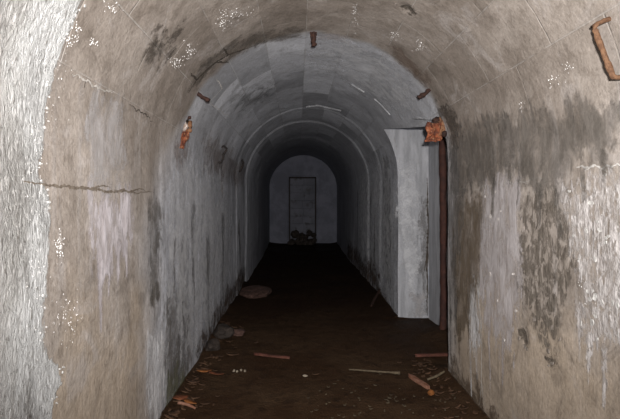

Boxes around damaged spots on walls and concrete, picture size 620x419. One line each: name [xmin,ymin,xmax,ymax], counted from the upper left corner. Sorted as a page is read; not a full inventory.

crack [24,181,154,198]
crack [72,74,114,93]
water stain [85,90,133,330]
water stain [144,26,183,63]
water stain [146,156,231,419]
water stain [437,99,620,351]